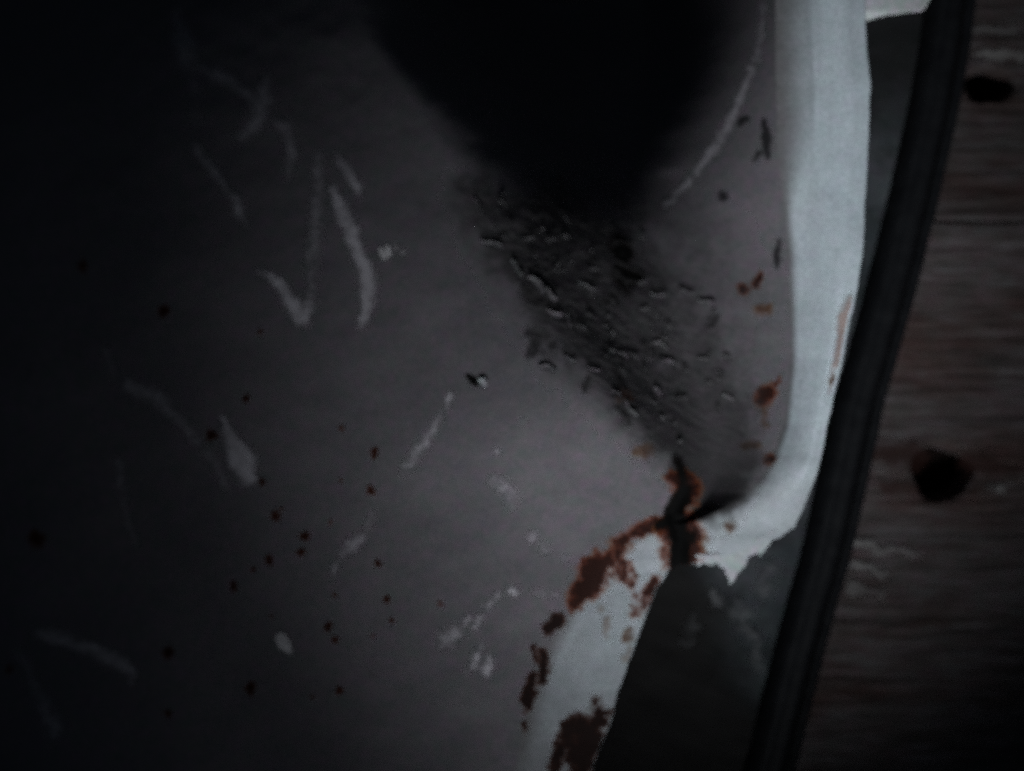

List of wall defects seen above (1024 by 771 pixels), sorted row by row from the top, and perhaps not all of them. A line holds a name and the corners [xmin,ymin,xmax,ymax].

rust [664,470,708,565]
peeling [696,530,778,585]
rust [519,516,671,730]
rust [546,697,613,771]